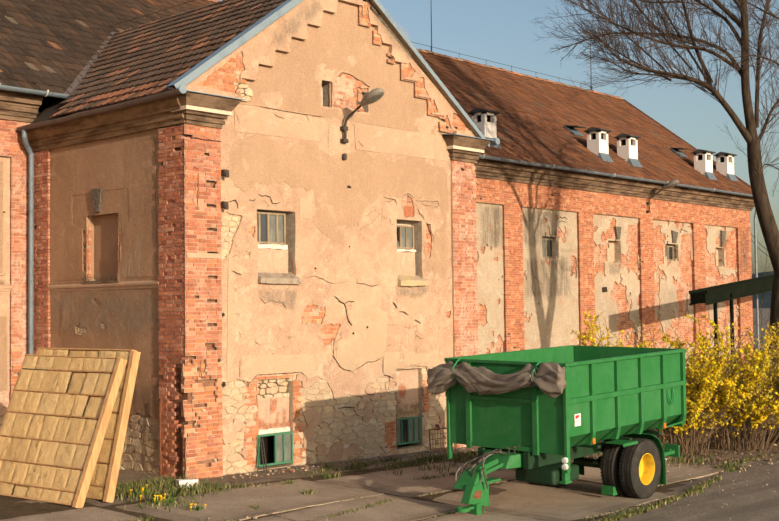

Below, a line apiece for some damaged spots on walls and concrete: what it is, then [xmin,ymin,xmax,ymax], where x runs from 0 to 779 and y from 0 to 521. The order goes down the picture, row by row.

spalling [328,72,369,113]
spalling [213,213,241,261]
spalling [626,224,638,256]
spalling [679,233,691,264]
spalling [724,230,737,270]
crack [307,274,380,326]
spalling [301,303,340,346]
crack [331,338,393,378]